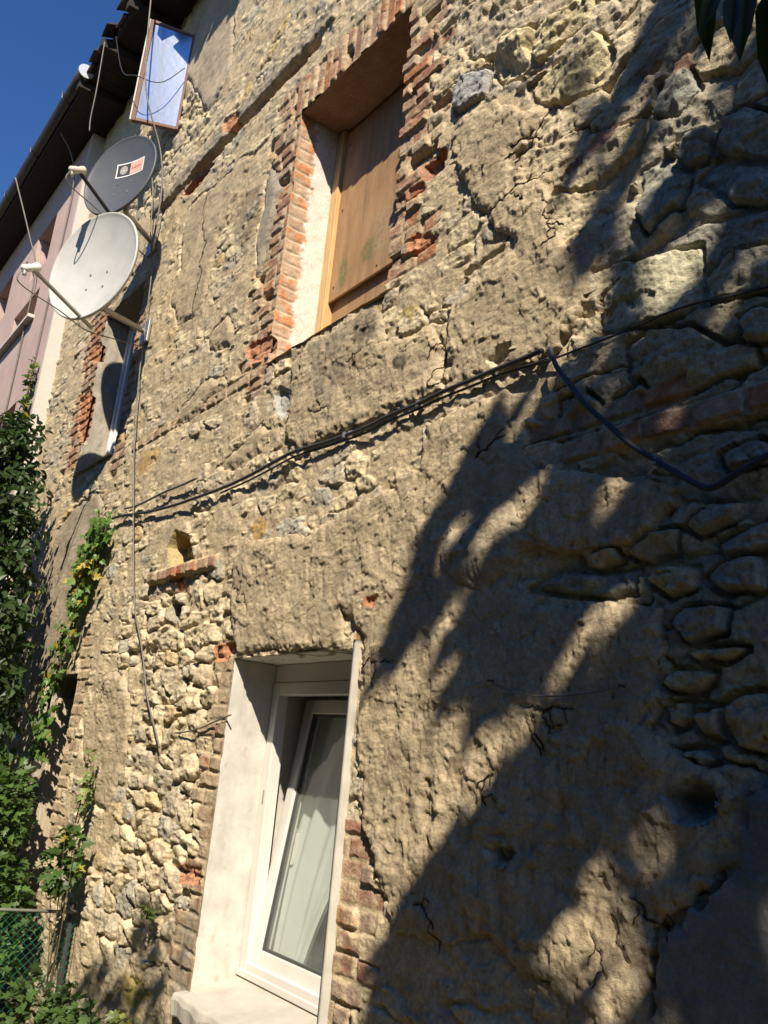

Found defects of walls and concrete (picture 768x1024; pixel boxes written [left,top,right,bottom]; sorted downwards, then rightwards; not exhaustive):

crack [490,109,564,246]
spalling [78,390,93,444]
spalling [167,529,195,568]
spalling [165,596,184,623]
peeling [83,667,133,815]
crack [525,704,573,756]
spalling [177,863,203,887]
crack [413,897,441,954]
crack [588,874,674,989]